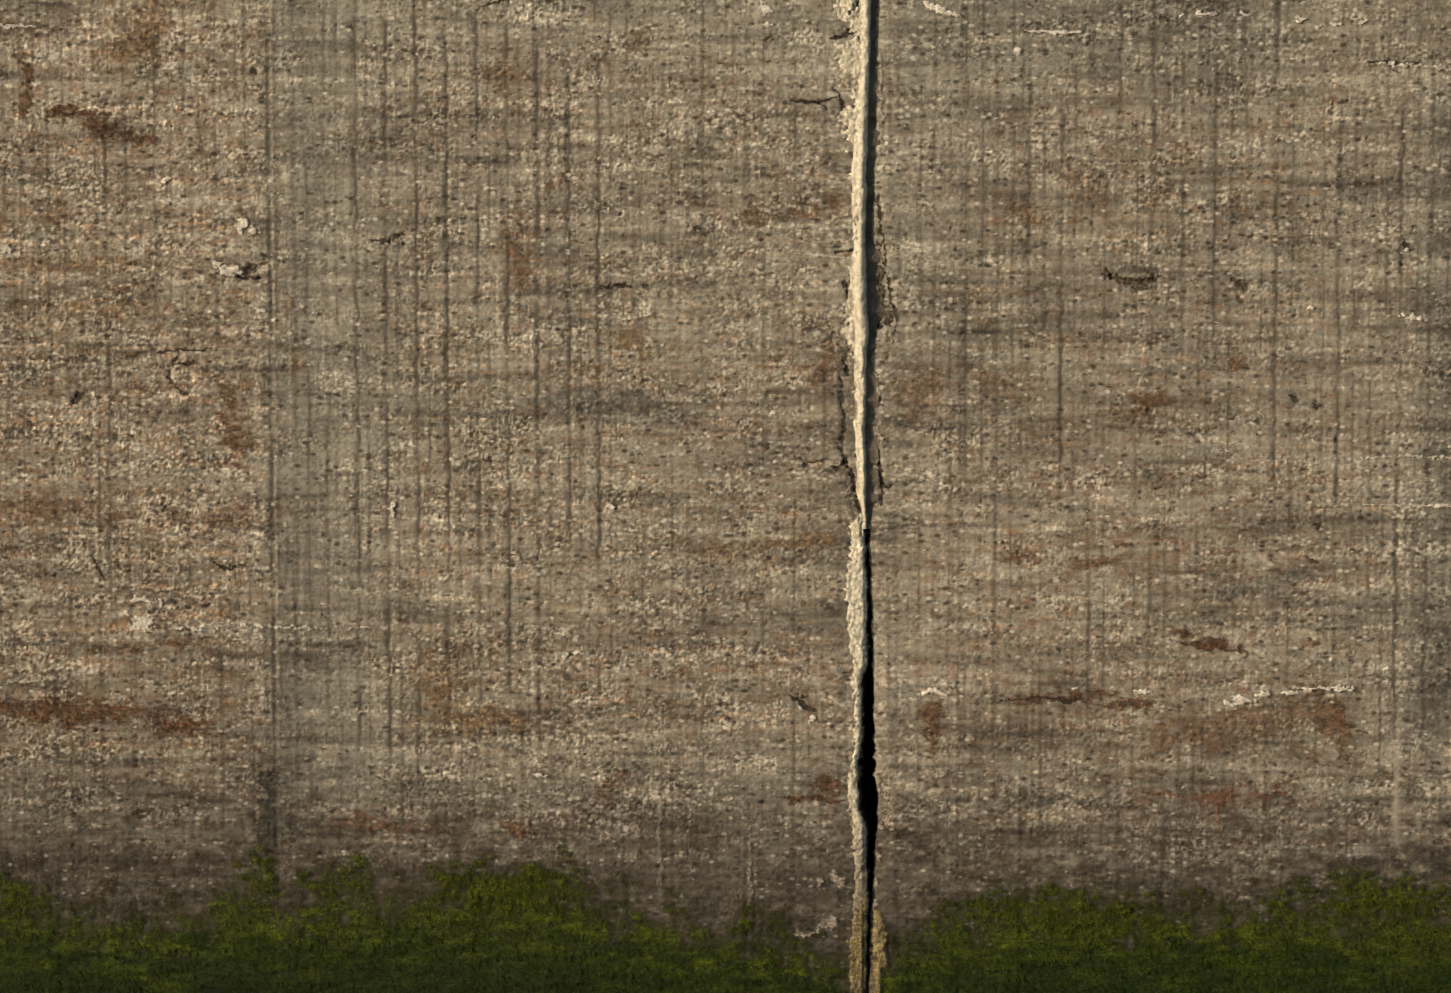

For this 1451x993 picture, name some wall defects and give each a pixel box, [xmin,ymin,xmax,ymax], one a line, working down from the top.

crack [830,0,859,40]
rust [15,52,157,151]
crack [791,90,848,141]
crack [841,280,849,300]
crack [874,181,898,344]
crack [802,357,895,546]
rust [0,691,214,751]
water stain [795,893,887,993]